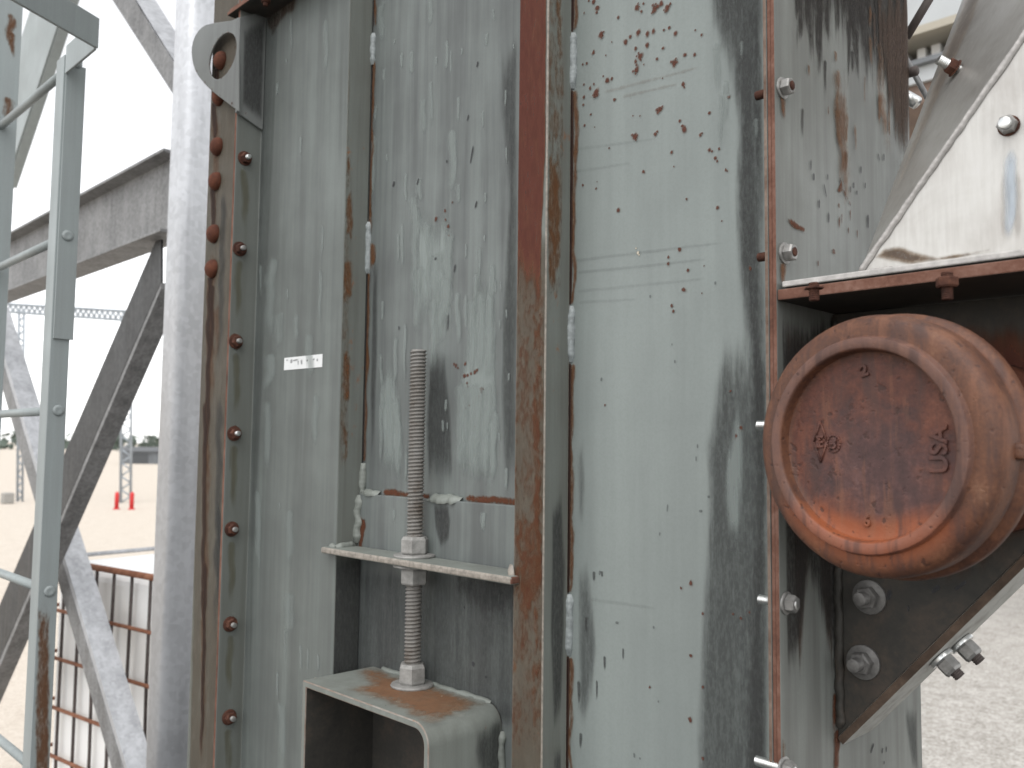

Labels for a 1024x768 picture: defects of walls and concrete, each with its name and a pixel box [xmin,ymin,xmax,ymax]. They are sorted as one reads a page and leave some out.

corrosion [599,26,677,75]
corrosion [635,0,671,14]
corrosion [828,52,858,237]
water stain [796,0,910,146]
corrosion [515,0,613,658]
water stain [703,0,764,768]
corrosion [983,332,1024,368]
corrosion [200,277,214,748]
corrosion [467,496,515,505]
corrosion [36,616,49,768]
corrosion [361,671,468,717]
corrosion [566,657,574,768]